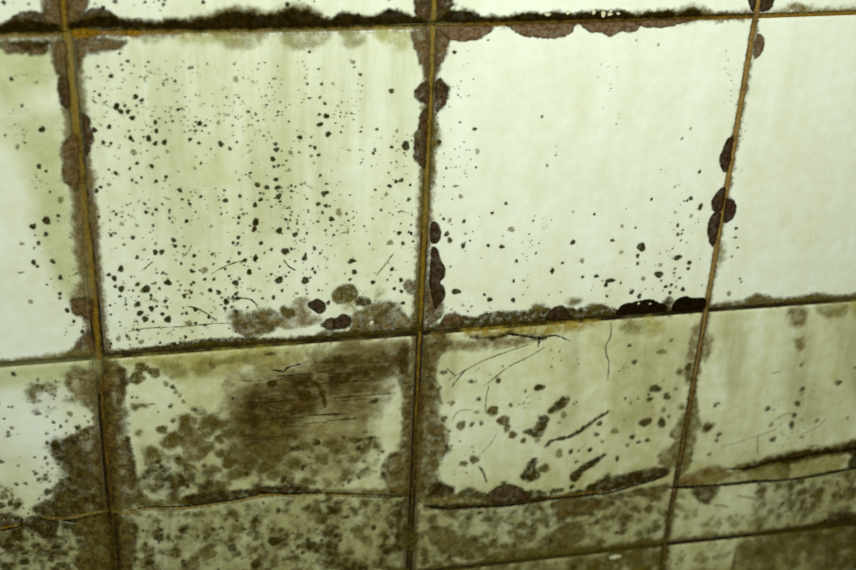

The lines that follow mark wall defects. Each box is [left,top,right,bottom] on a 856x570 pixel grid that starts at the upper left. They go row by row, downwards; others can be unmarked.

rust [71,29,102,39]
water stain [0,0,774,184]
water stain [60,113,121,277]
water stain [0,174,856,570]
crack [447,333,567,407]
crack [0,447,856,531]